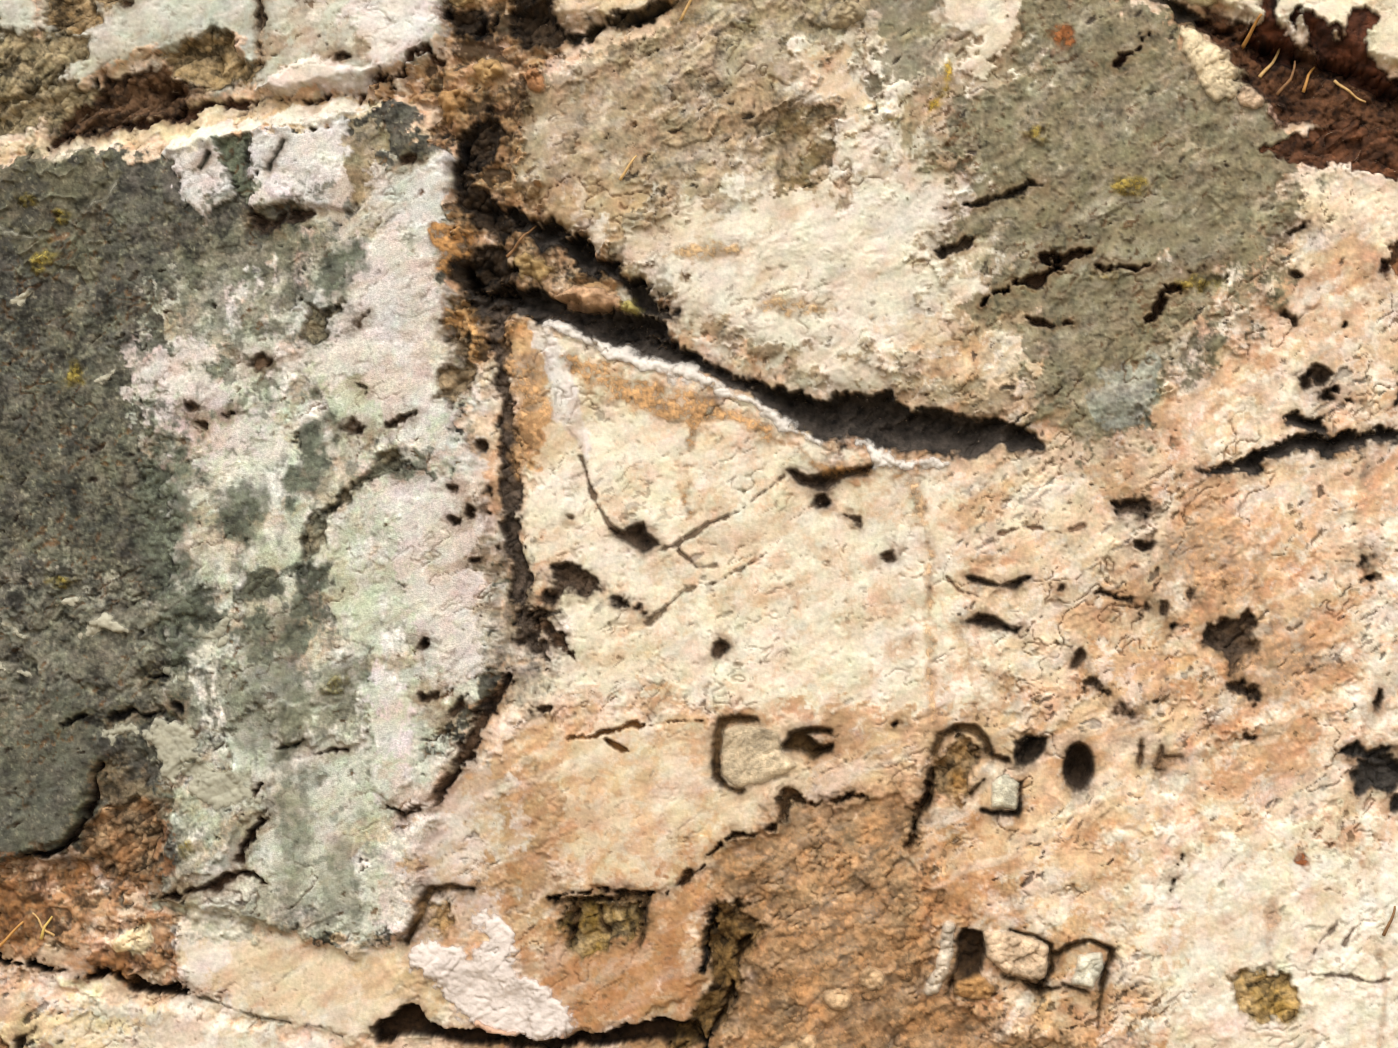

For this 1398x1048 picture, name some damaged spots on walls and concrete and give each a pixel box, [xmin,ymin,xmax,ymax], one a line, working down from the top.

spalling [0,0,265,145]
crack [557,0,675,46]
crack [1113,0,1398,140]
peeling [1243,0,1398,105]
peeling [1259,116,1398,181]
water stain [315,240,366,296]
water stain [286,412,336,506]
crack [1179,411,1398,476]
water stain [140,447,209,671]
water stain [214,487,270,556]
crack [387,207,1045,819]
spalling [718,801,991,1048]